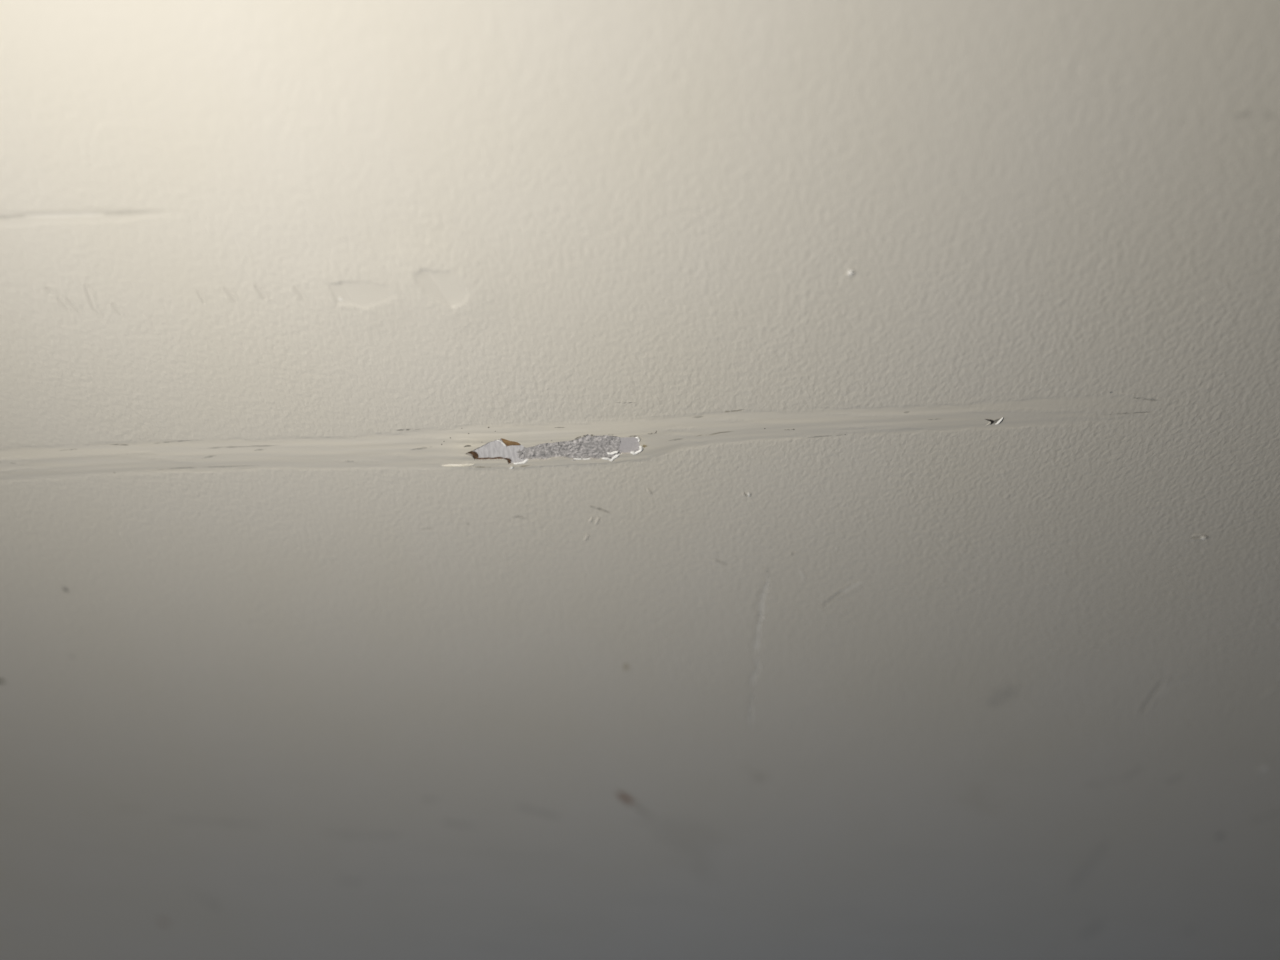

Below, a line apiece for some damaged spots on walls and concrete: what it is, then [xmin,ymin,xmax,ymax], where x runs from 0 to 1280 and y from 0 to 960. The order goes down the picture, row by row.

peeling [465,434,648,469]